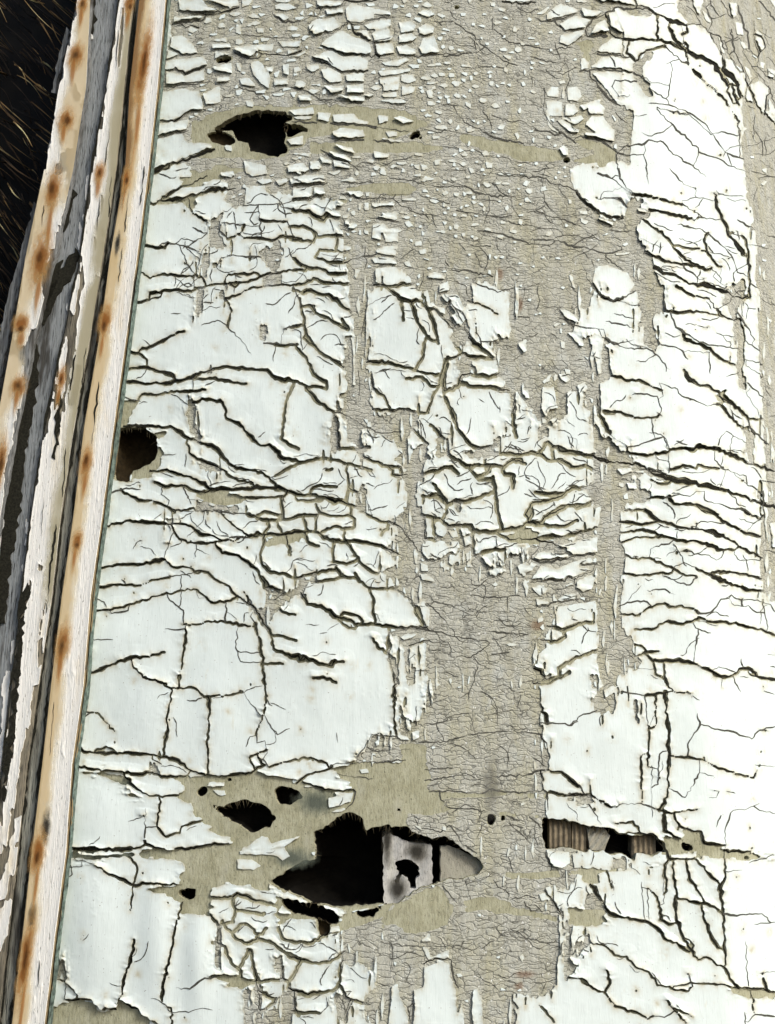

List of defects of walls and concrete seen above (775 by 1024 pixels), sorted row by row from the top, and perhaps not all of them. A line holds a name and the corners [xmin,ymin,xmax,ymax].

rust [58,110,73,142]
rust [133,28,152,155]
crack [234,0,393,73]
rust [14,170,60,346]
peeling [127,354,172,383]
peeling [414,302,436,339]
peeling [0,0,165,1024]
peeling [305,500,353,532]
crack [70,148,640,909]
crack [366,0,775,1024]
rust [17,920,35,1024]
crack [182,893,369,1024]